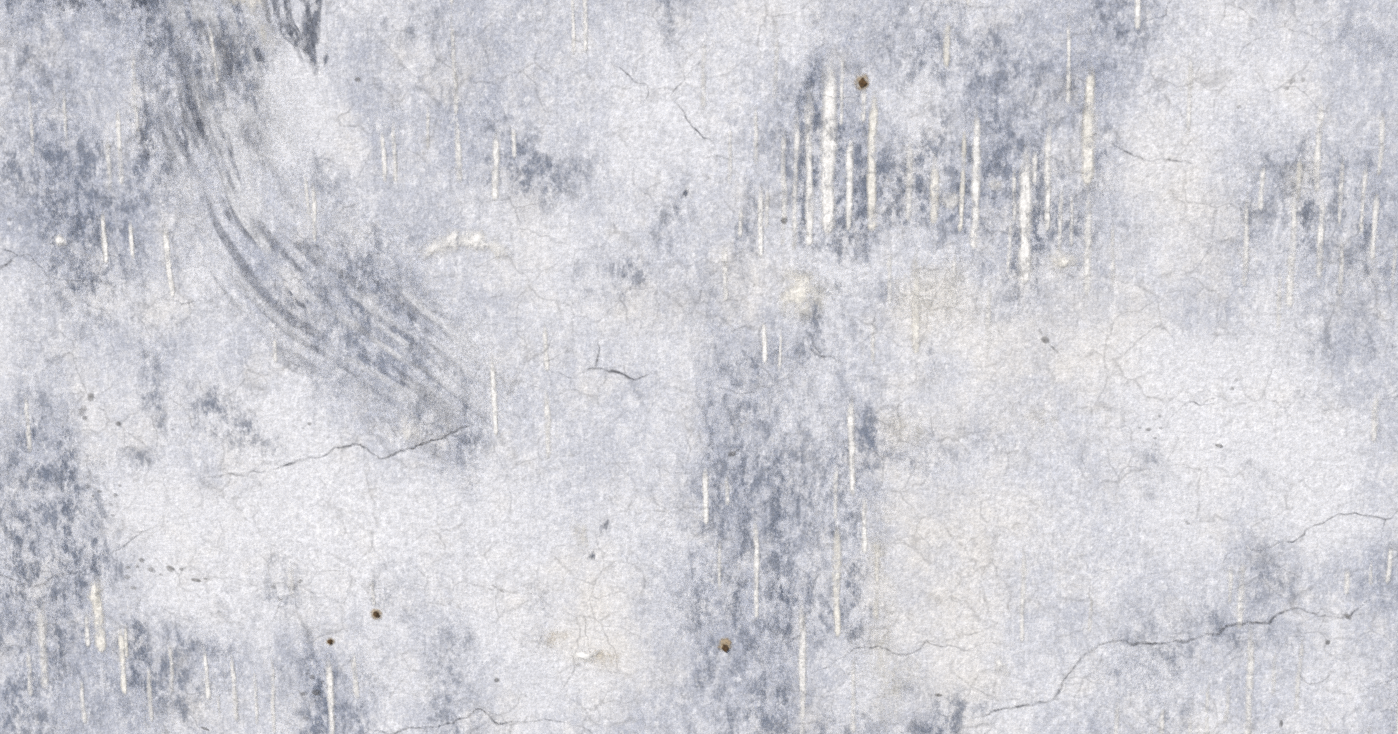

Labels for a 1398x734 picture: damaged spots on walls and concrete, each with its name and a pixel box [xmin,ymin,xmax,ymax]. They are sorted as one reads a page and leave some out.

damp [8,60,148,263]
damp [161,19,261,154]
damp [263,0,309,44]
damp [738,60,1091,293]
damp [1082,74,1095,184]
damp [1277,104,1344,326]
damp [1359,119,1385,259]
damp [12,443,96,571]
damp [703,472,724,527]
damp [725,465,811,617]
damp [821,404,879,636]
damp [762,600,811,732]